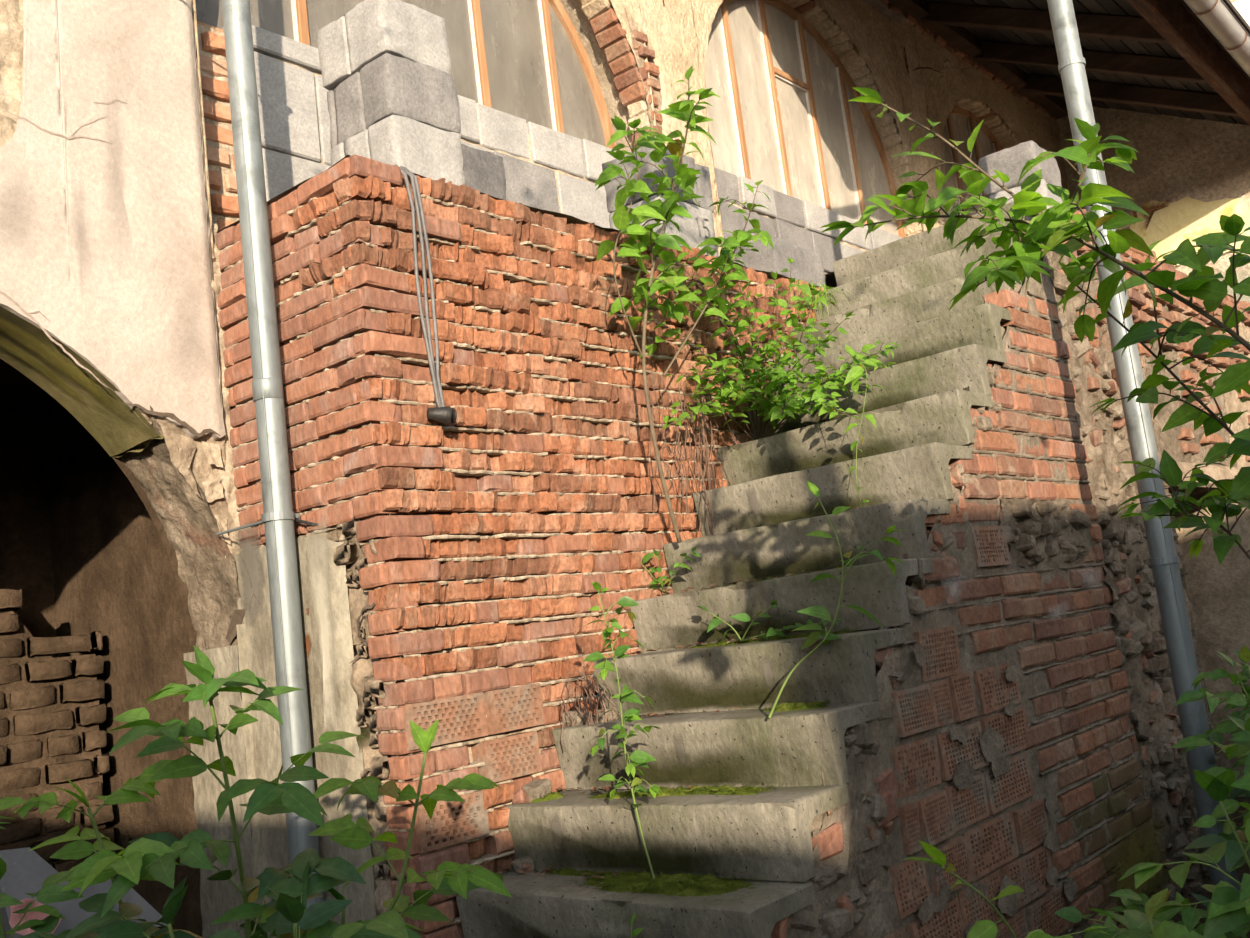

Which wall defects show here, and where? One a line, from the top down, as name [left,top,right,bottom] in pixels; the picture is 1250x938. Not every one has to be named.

flaking render [0,0,24,147]
crack [0,99,126,144]
flaking render [1129,196,1250,266]
flaking render [132,410,232,565]
spalling [999,498,1091,566]